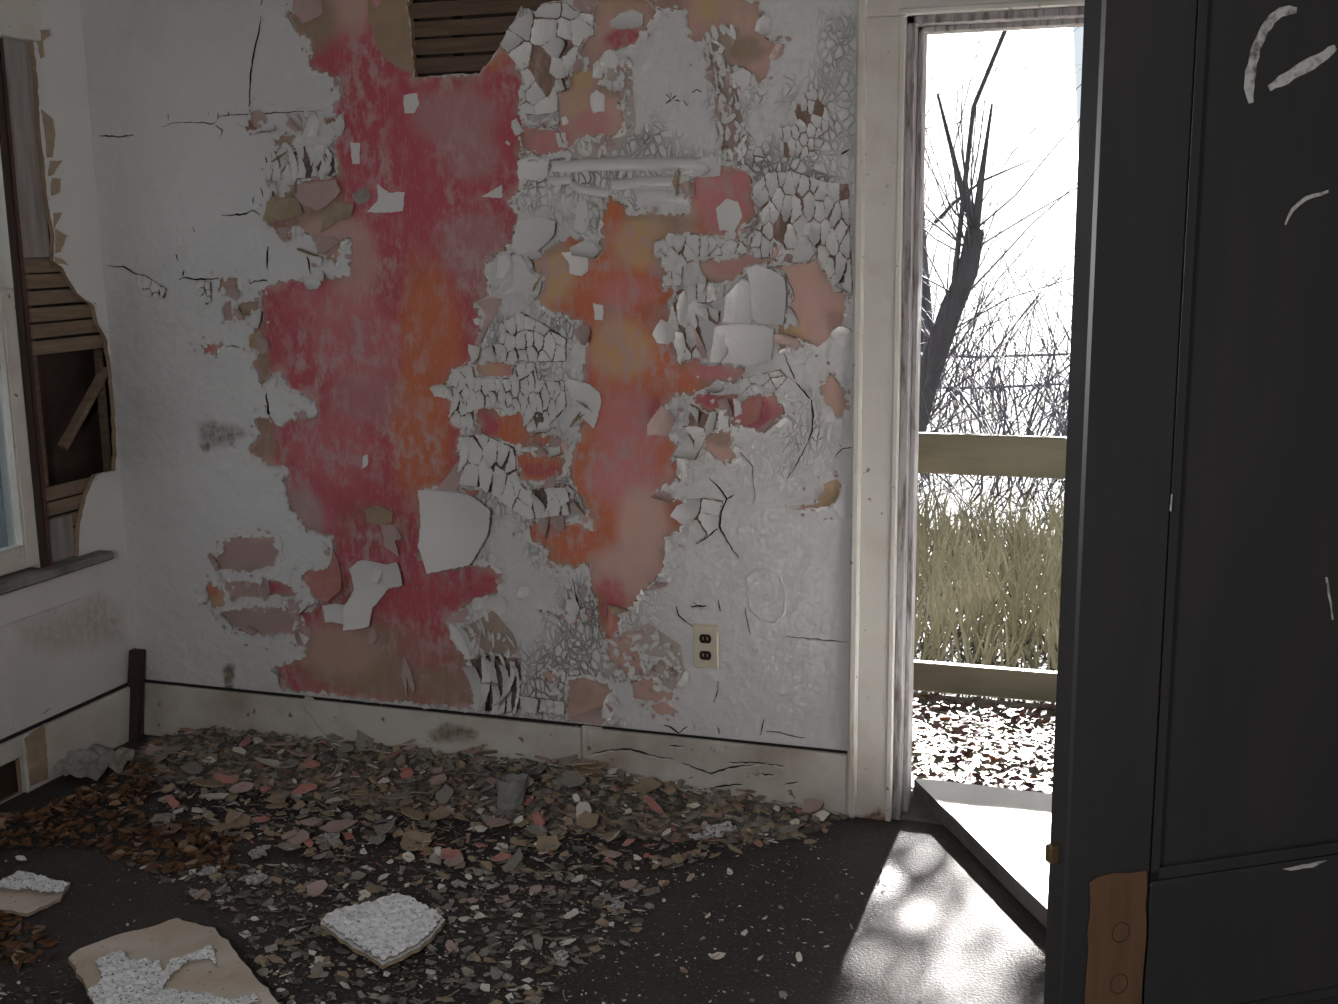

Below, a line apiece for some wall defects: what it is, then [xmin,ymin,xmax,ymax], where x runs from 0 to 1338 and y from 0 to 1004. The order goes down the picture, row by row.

spalling [37,30,50,58]
crack [100,0,336,305]
crack [500,2,853,364]
spalling [24,110,116,541]
peeling [187,0,853,727]
crack [683,353,851,559]
crack [570,579,751,691]
crack [590,681,806,790]
crack [785,636,849,644]